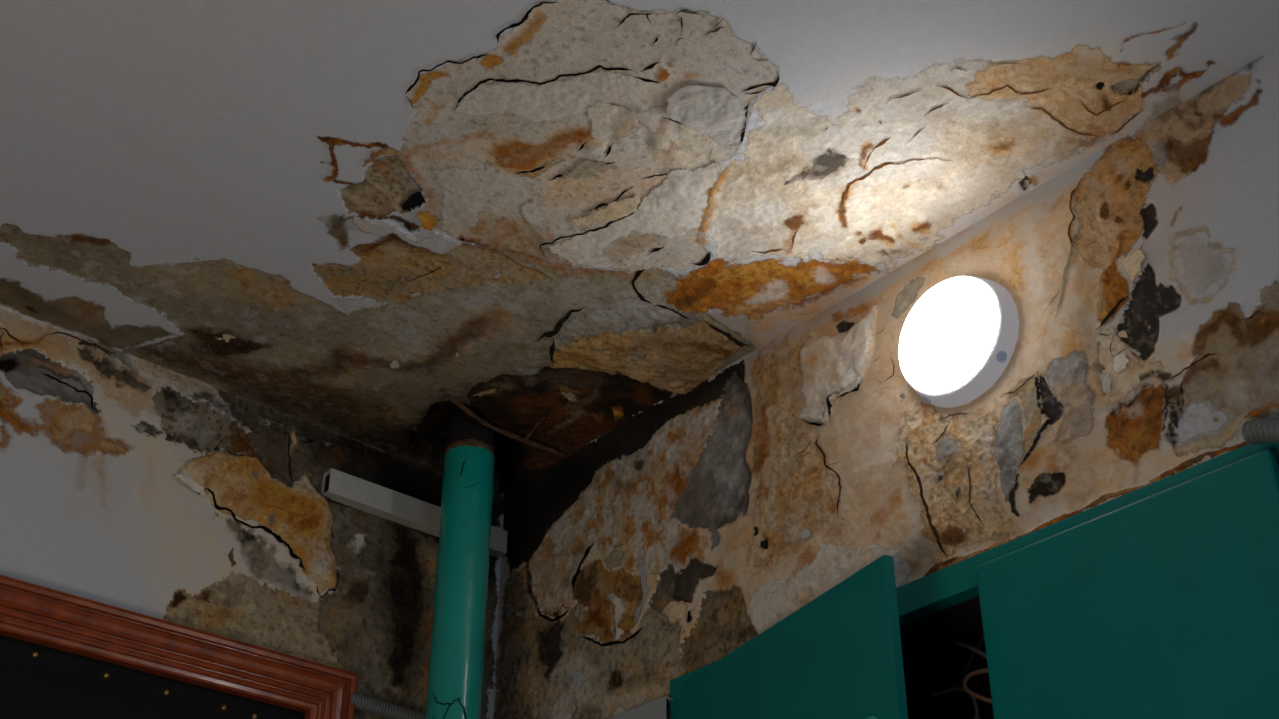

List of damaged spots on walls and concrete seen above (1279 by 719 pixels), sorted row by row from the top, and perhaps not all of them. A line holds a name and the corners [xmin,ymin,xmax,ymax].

corrosion [0,383,129,456]
water stain [0,279,444,719]
flaking render [163,451,348,670]
flaking render [0,0,1096,472]
crack [405,0,724,111]
crack [516,142,668,258]
flaking render [526,372,911,675]
crack [730,43,779,146]
corrosion [666,257,875,320]
crack [842,63,1144,204]
flaking render [892,203,1181,557]
corrosion [1072,23,1262,325]